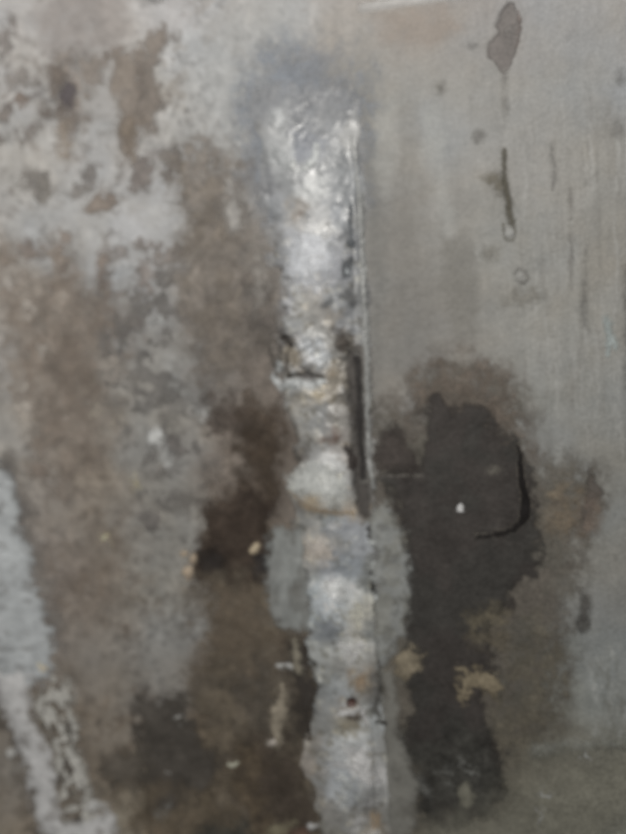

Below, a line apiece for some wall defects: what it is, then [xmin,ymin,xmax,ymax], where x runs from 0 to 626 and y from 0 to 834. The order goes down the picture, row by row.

water stain [40,24,167,163]
water stain [487,149,515,241]
water stain [0,243,119,502]
crack [475,445,530,538]